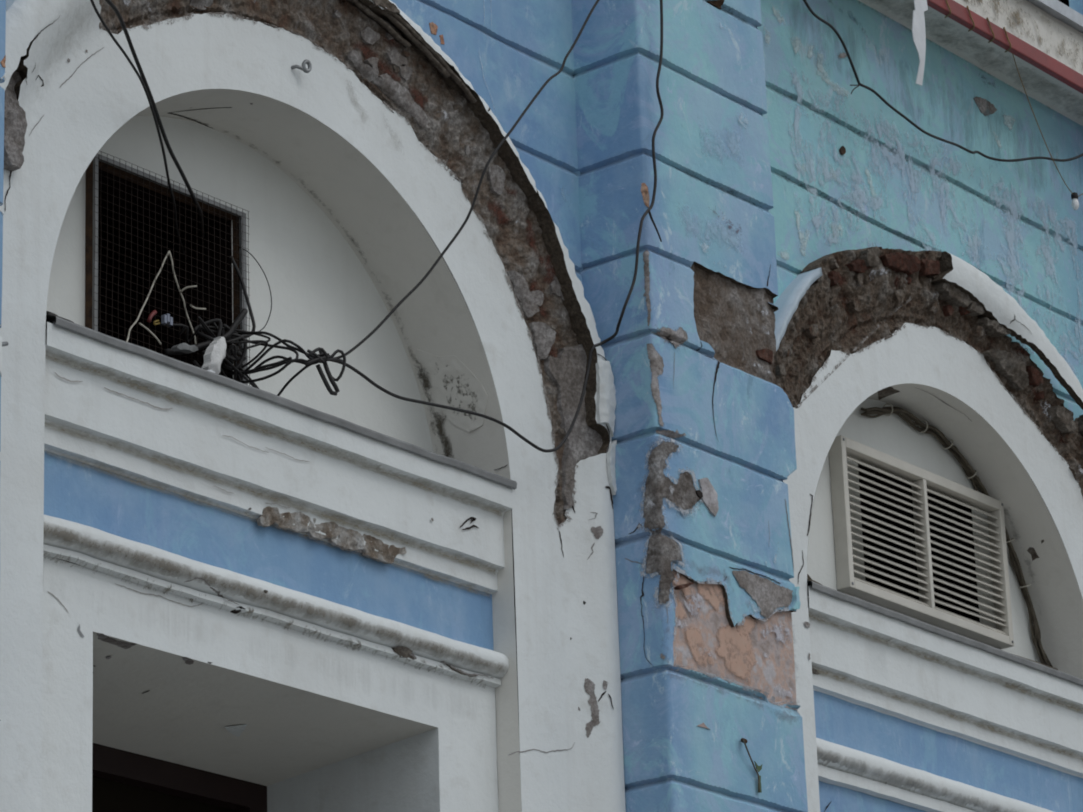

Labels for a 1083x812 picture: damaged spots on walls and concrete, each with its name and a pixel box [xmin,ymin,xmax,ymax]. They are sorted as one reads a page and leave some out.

spalling [0,55,44,211]
spalling [99,0,617,527]
spalling [643,250,651,330]
spalling [691,246,1083,496]
flaking render [245,506,406,564]
flaking render [637,343,810,710]
peeling [578,678,614,737]